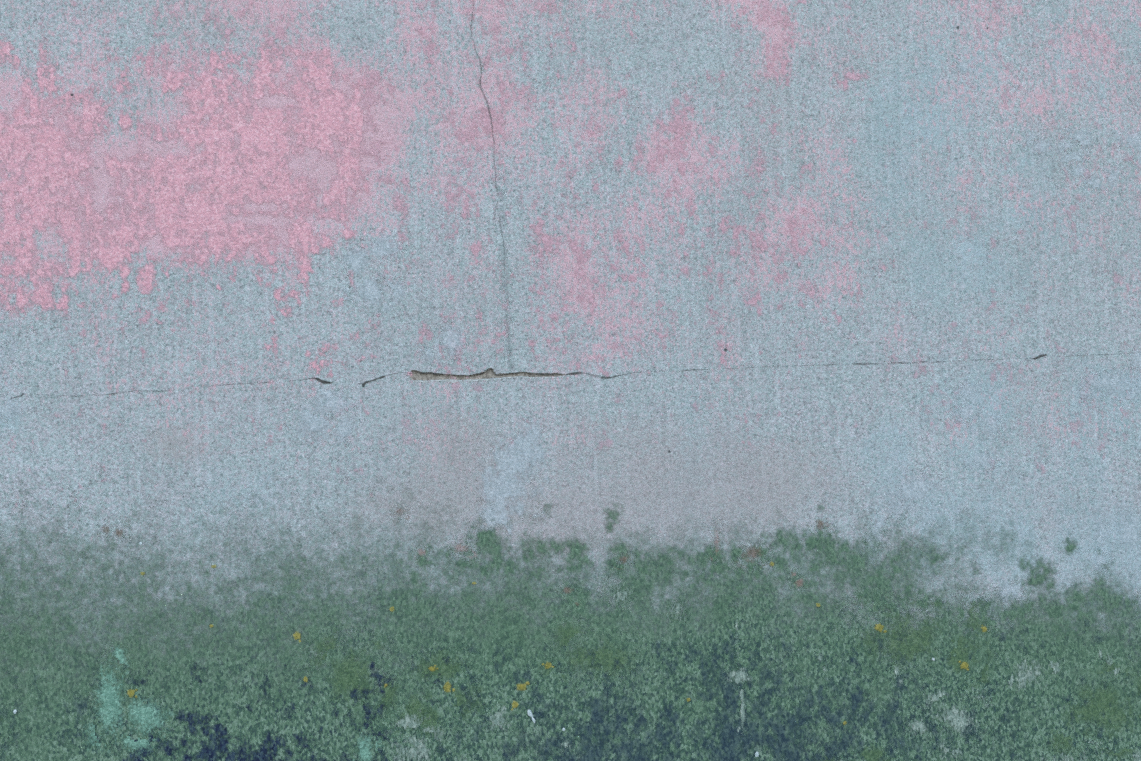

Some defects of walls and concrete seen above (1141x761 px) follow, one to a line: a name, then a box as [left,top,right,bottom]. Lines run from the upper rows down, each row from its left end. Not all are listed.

peeling [0,1,397,353]
crack [293,368,637,385]
damp [79,648,443,761]
damp [480,707,510,731]
damp [545,688,680,761]
damp [697,621,872,761]
damp [909,690,977,761]
damp [1007,658,1062,691]